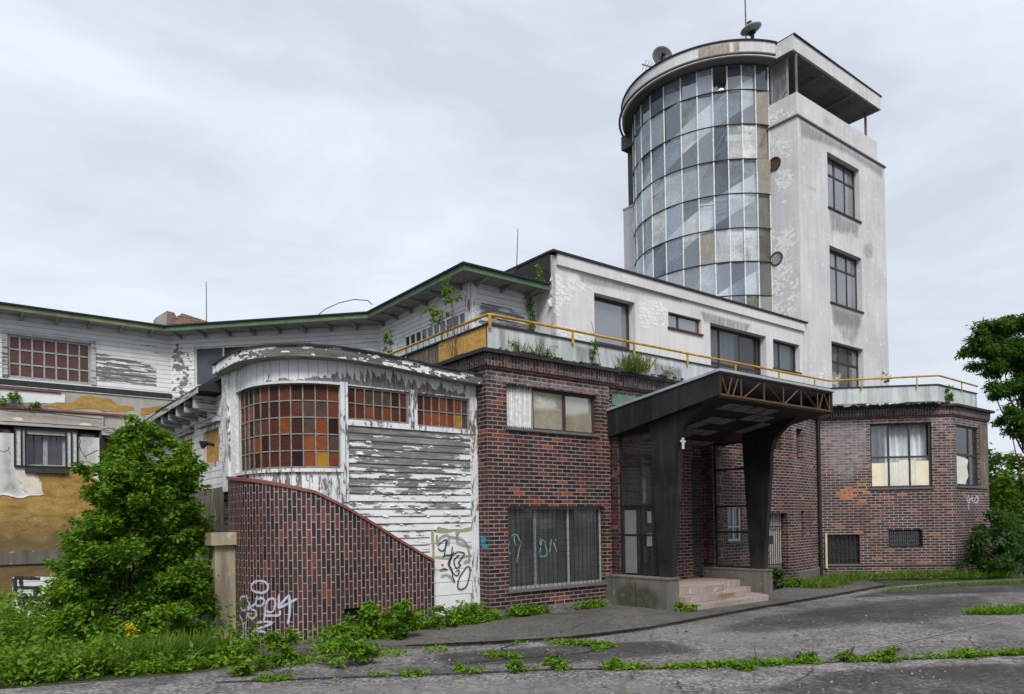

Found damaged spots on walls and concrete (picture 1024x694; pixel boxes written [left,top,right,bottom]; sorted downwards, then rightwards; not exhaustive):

peeling [547,272,593,340]
peeling [771,228,799,317]
spalling [0,344,192,417]
peeling [212,346,290,374]
peeling [265,347,480,397]
spalling [0,469,99,551]
peeling [242,425,472,574]